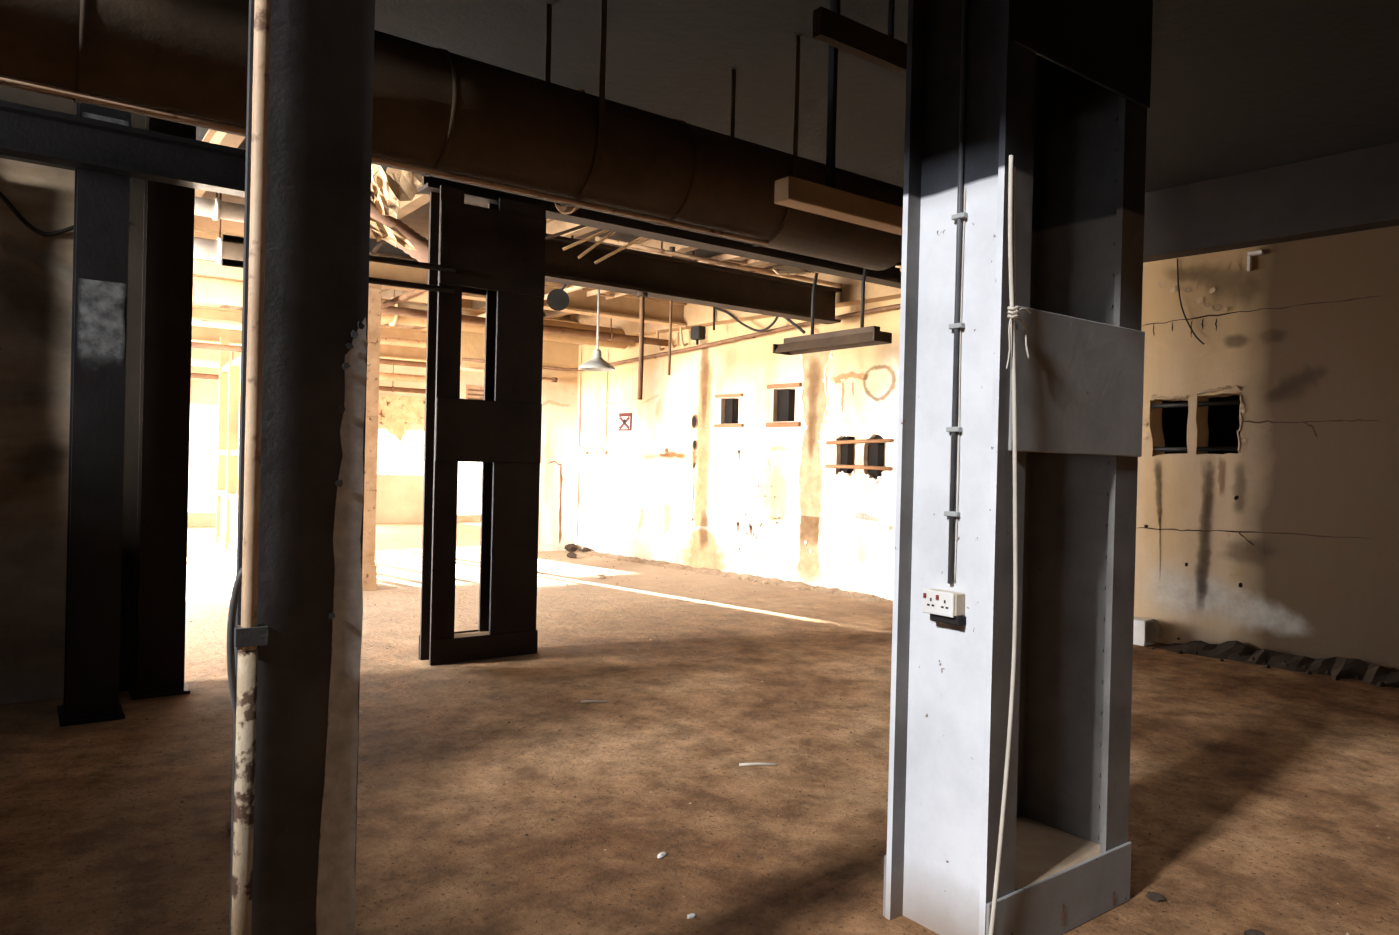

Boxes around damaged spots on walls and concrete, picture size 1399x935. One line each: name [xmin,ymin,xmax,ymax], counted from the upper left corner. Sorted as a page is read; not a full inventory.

damp [637,327,799,572]
damp [1134,463,1329,644]